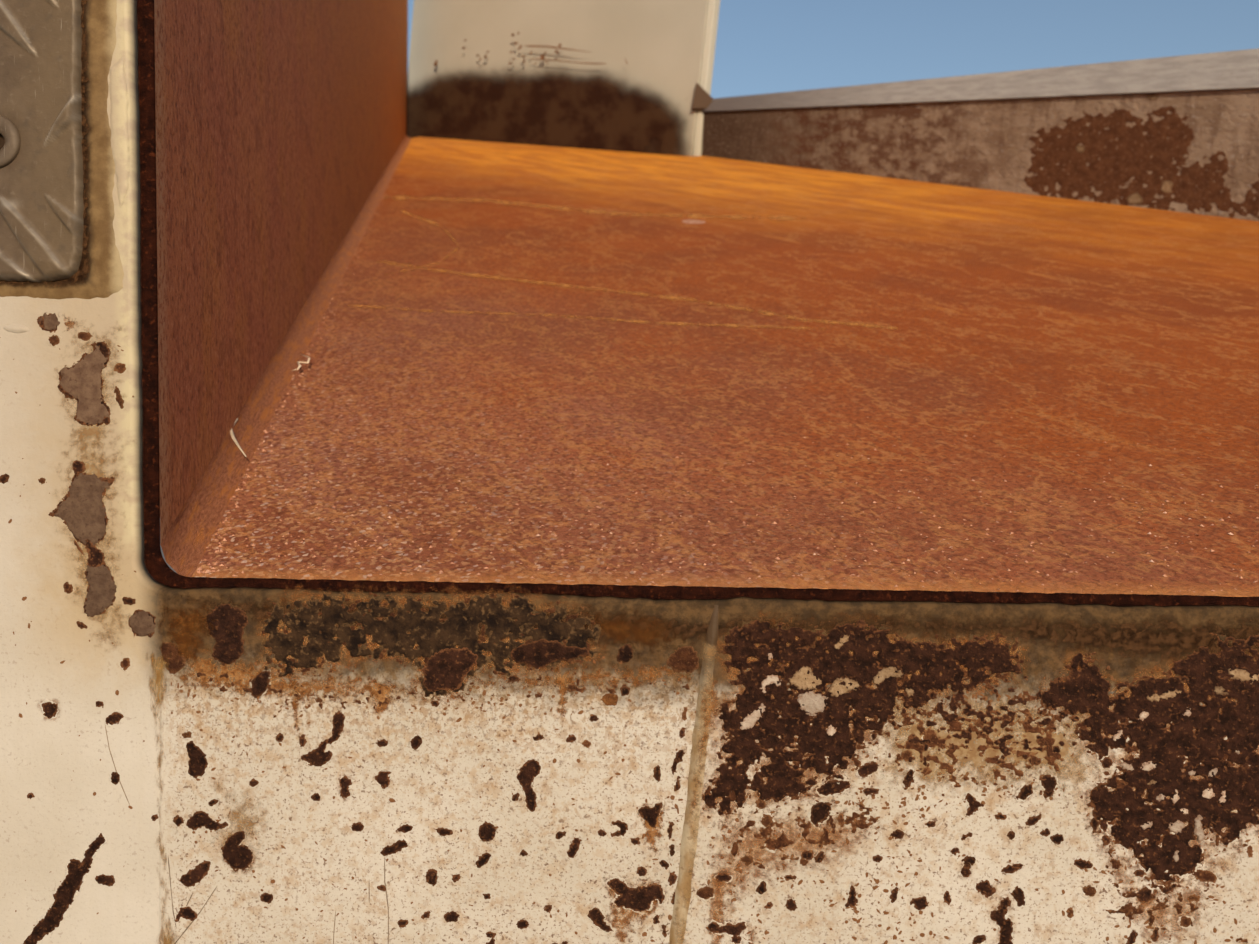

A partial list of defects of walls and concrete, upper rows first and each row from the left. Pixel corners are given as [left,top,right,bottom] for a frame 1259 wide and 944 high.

rust [1024,93,1259,218]
peeling [37,312,62,348]
peeling [57,330,126,426]
peeling [48,460,156,638]
rust [149,591,1259,944]